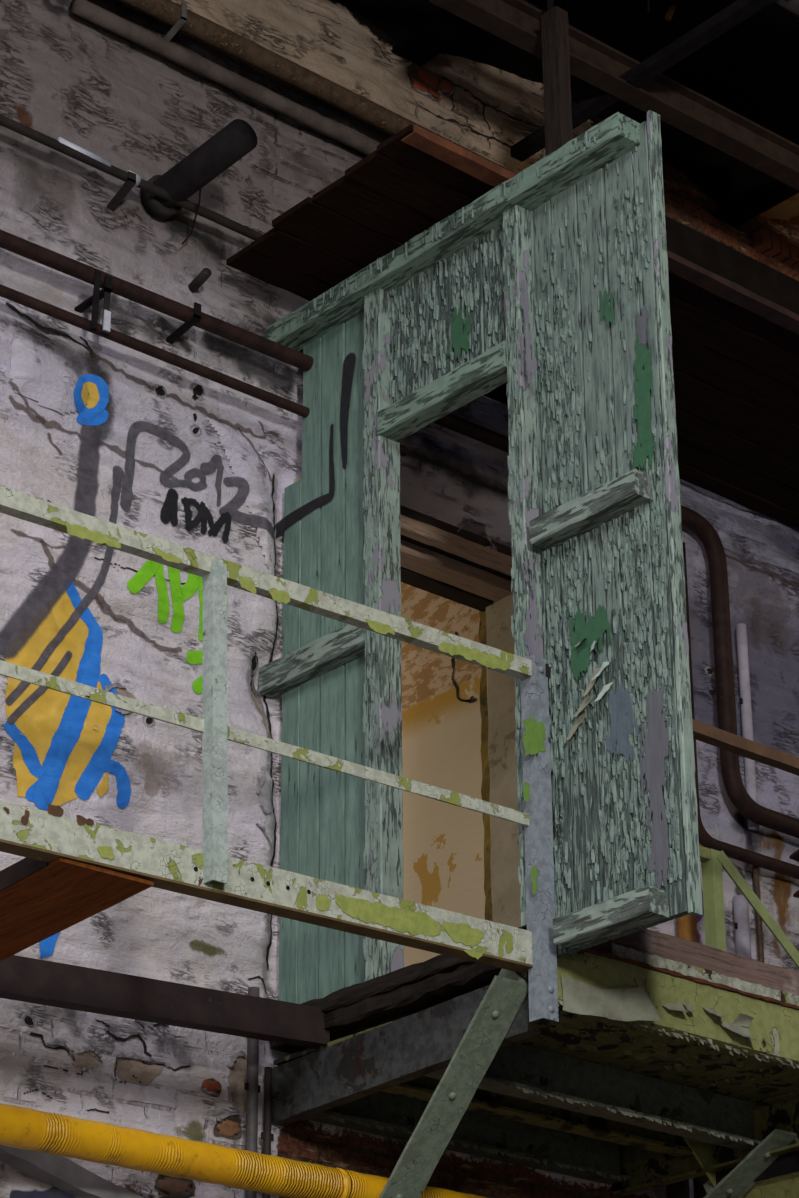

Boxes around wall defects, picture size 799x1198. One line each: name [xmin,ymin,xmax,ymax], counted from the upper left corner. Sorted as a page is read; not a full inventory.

flaking render [408,63,457,102]
crack [425,77,540,148]
peeling [281,146,682,960]
peeling [238,575,290,604]
spalling [21,1013,35,1028]
crack [23,1032,83,1099]
flaking render [46,1038,166,1085]
crack [96,1019,191,1084]
flaking render [201,1050,247,1140]
peeling [481,1080,760,1146]
peeling [546,975,799,1086]
flaking render [154,1174,196,1197]